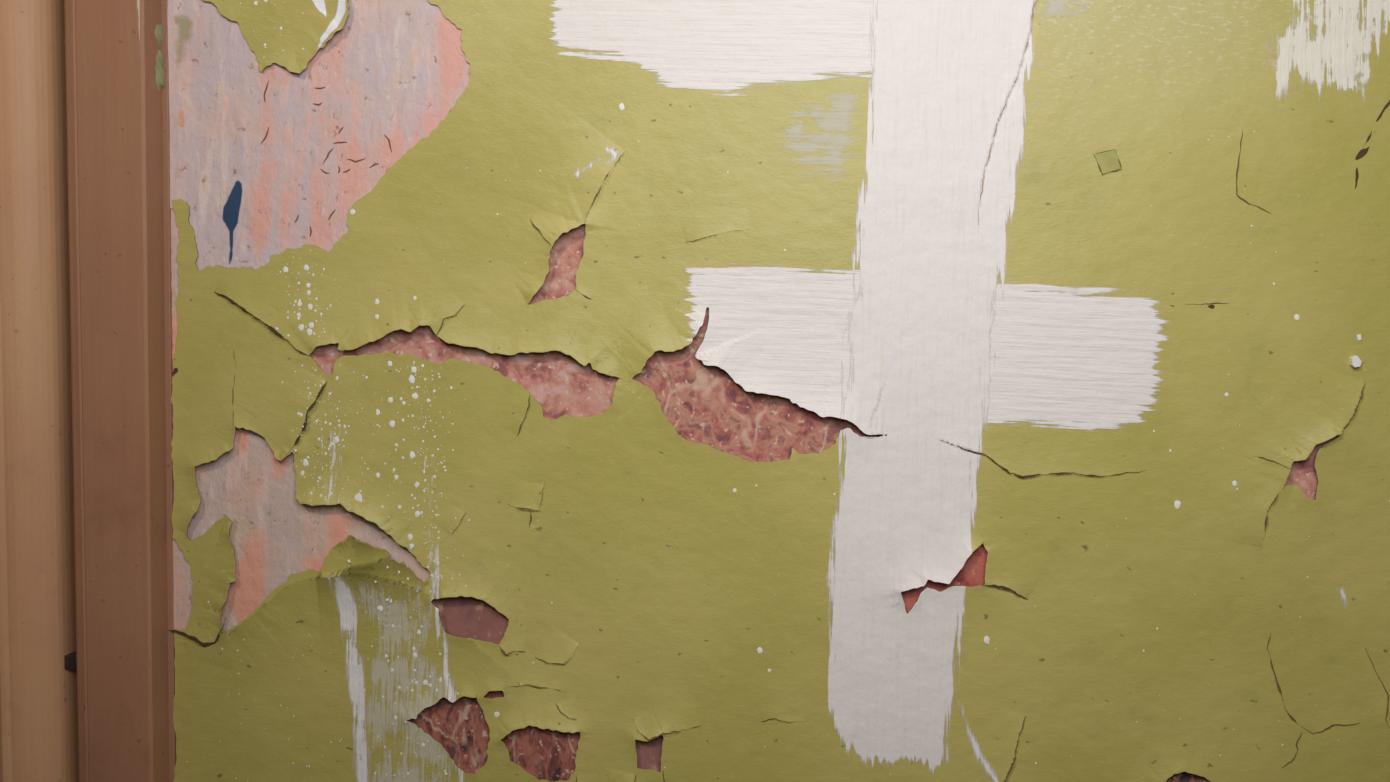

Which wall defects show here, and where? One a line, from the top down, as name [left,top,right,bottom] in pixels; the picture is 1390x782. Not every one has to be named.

crack [978,1,1037,226]
peeling [167,0,485,434]
crack [1236,129,1271,214]
peeling [293,210,887,483]
crack [941,440,1145,478]
peeling [1268,402,1363,516]
peeling [172,407,526,659]
peeling [901,527,1001,614]
peeling [397,680,596,782]
peeling [1125,753,1261,782]